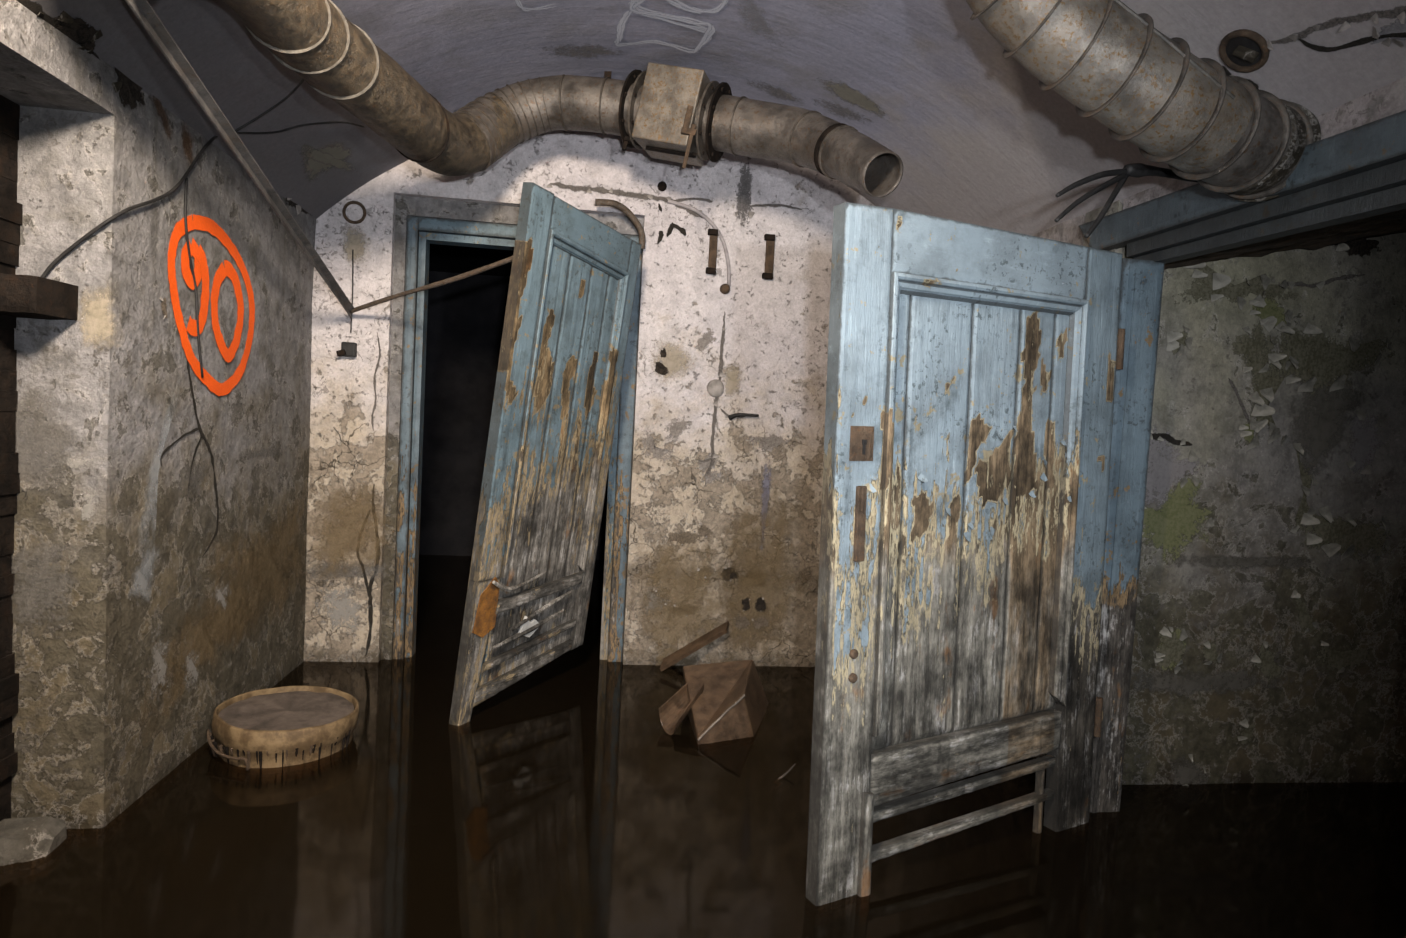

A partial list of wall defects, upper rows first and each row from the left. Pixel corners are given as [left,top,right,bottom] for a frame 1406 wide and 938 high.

spalling [54,11,103,50]
spalling [1335,235,1386,259]
peeling [1166,326,1193,357]
peeling [1172,262,1399,535]
peeling [1145,427,1207,508]
damp [643,465,800,660]